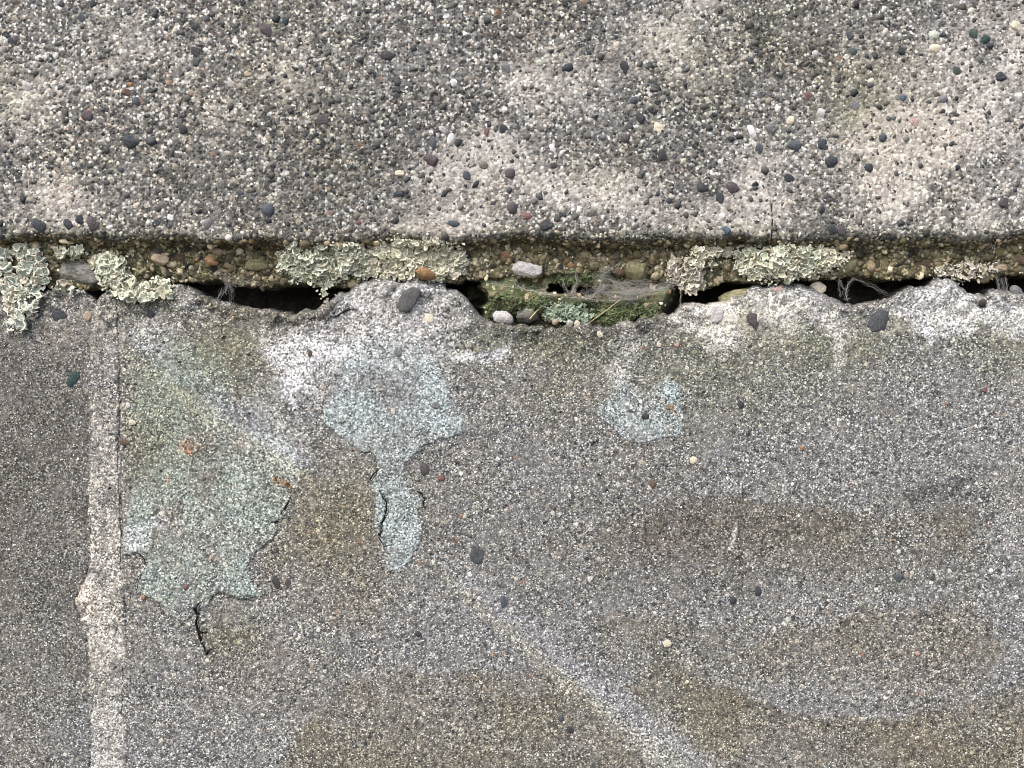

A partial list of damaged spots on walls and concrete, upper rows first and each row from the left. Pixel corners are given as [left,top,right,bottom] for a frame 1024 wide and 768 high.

spalling [184,284,343,326]
spalling [474,308,680,336]
spalling [841,298,891,313]
spalling [959,287,1024,304]
peeling [174,325,274,397]
peeling [124,363,295,626]
peeling [319,371,464,568]
crack [162,593,247,655]